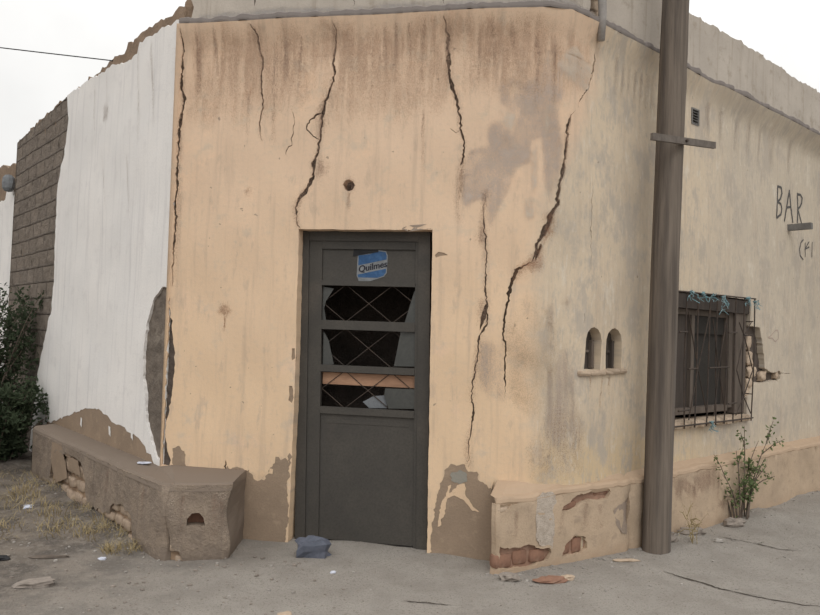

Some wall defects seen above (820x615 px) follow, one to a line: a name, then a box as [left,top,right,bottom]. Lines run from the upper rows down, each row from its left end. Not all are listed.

flaking render [4,97,69,393]
crack [171,33,187,287]
crack [250,24,266,133]
crack [286,26,340,227]
leakage [171,0,598,172]
crack [440,0,572,467]
flaking render [47,287,186,466]
flaking render [745,325,779,398]
flaking render [51,442,87,504]
flaking render [98,504,132,540]
peeling [226,453,292,542]
peeling [430,464,608,569]